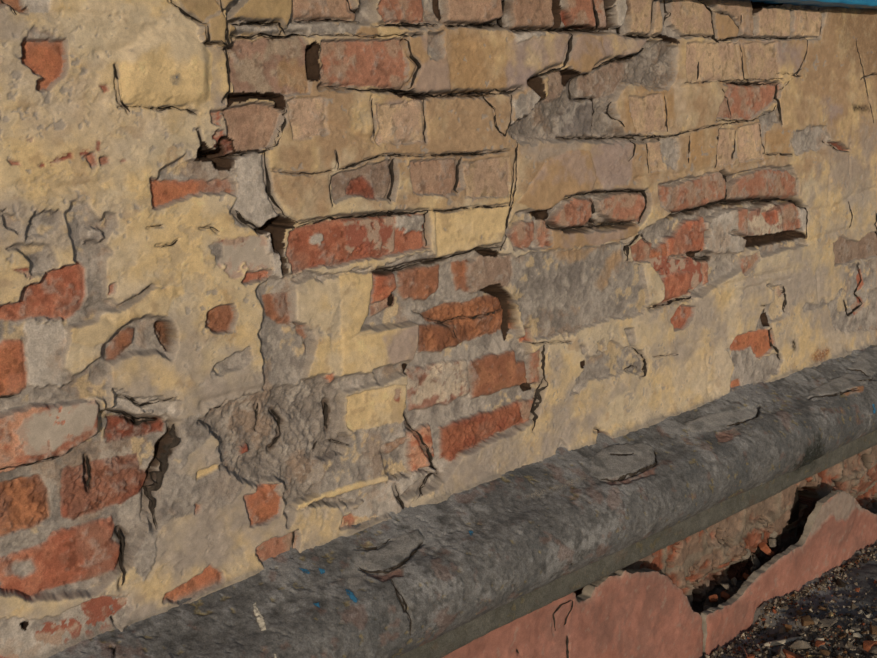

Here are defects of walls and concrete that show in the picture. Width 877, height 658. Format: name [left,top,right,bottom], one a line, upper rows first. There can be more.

flaking render [21,24,68,91]
flaking render [150,0,420,208]
spalling [375,0,826,172]
crack [856,39,876,123]
peeling [38,140,110,168]
flaking render [791,125,850,155]
spalling [0,149,809,601]
crack [417,469,436,499]
crack [601,452,657,482]
crack [356,539,422,636]
spalling [0,594,133,658]
crack [553,600,573,658]